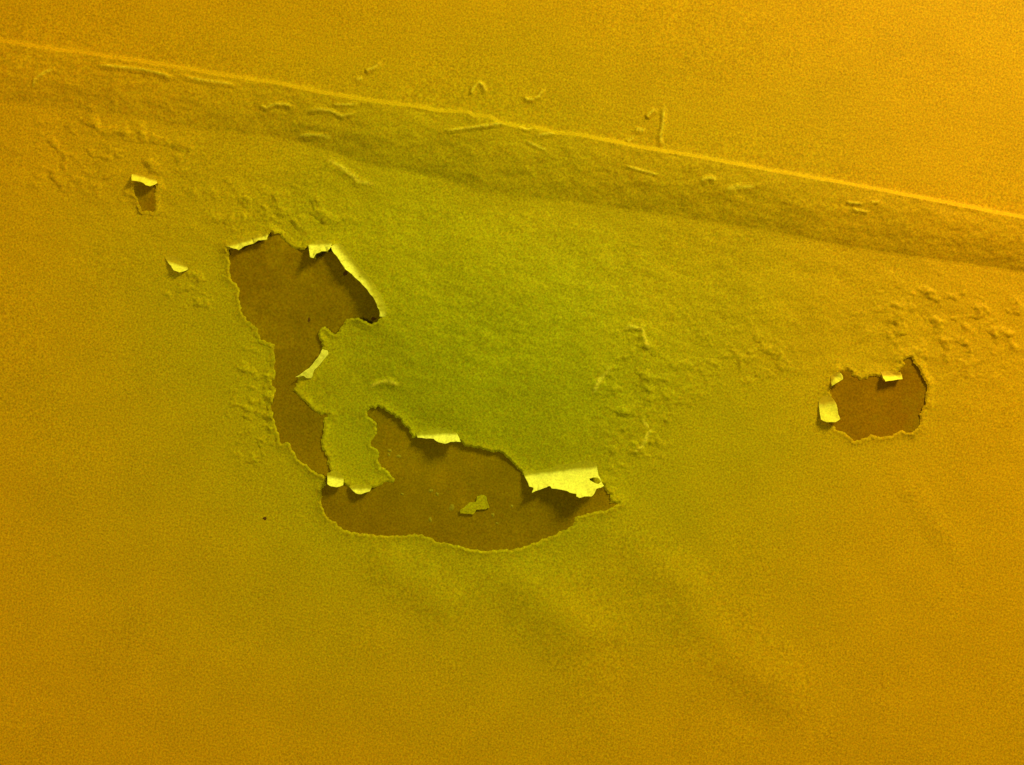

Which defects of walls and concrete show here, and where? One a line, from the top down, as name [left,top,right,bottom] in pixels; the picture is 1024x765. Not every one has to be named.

peeling [124,173,166,223]
peeling [165,255,188,273]
peeling [211,216,637,565]
peeling [813,343,942,456]